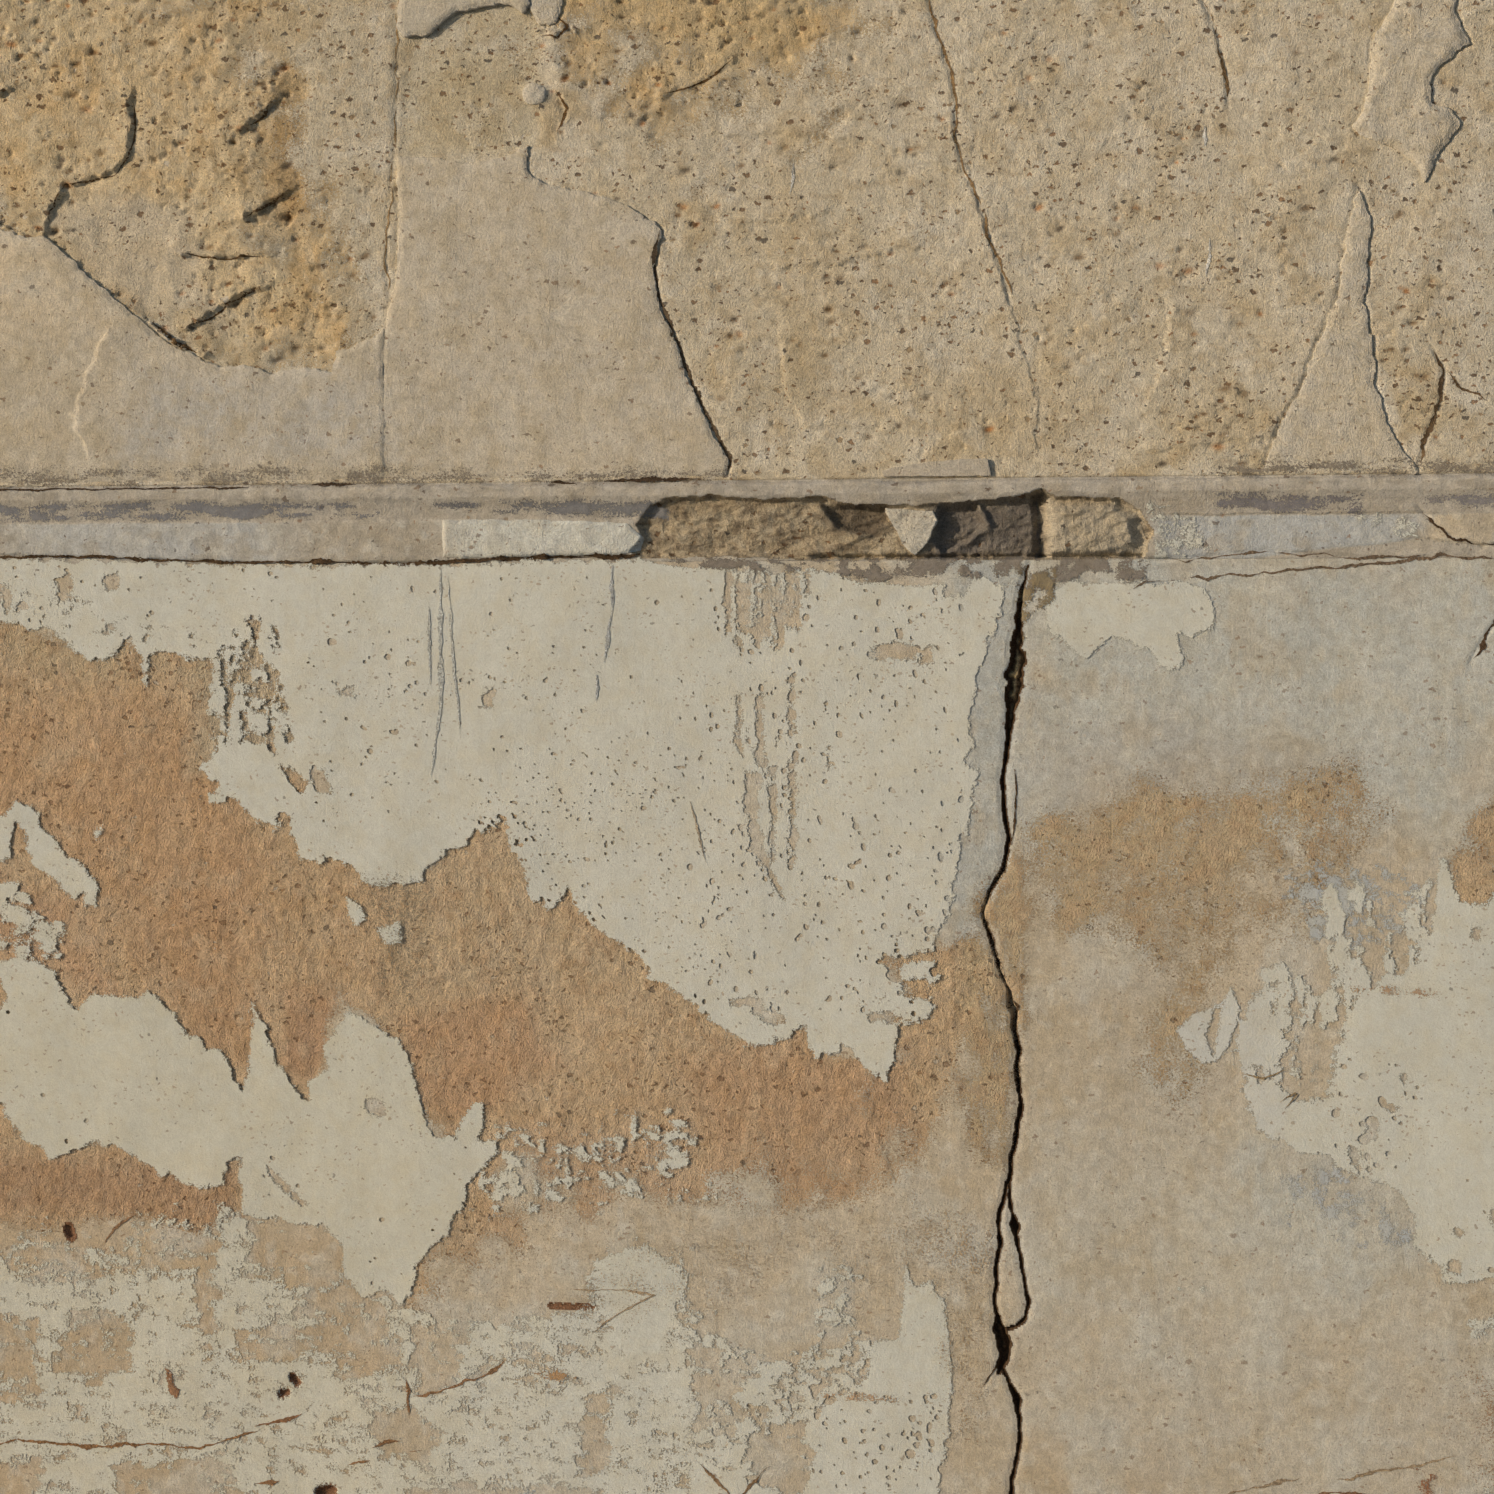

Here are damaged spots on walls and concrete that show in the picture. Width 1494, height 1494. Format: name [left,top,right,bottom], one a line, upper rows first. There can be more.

spalling [396,0,908,170]
spalling [0,0,729,487]
crack [651,231,732,476]
crack [0,485,249,493]
crack [312,480,356,488]
crack [551,476,690,484]
crack [1133,515,1494,589]
crack [1470,620,1494,663]
peeling [0,488,1494,1494]
crack [981,564,1031,1494]